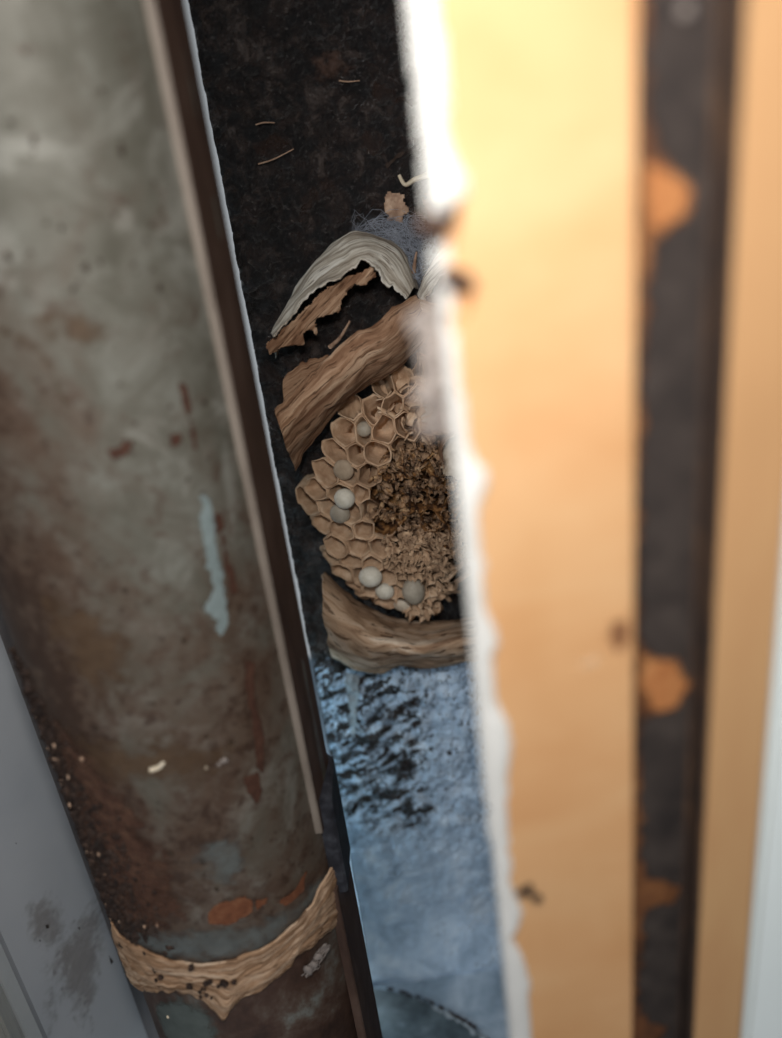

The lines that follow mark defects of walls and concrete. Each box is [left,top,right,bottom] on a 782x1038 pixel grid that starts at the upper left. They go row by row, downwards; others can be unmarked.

rust [108,440,133,460]
rust [169,382,197,450]
peeling [199,494,228,636]
rust [214,513,238,594]
rust [89,740,222,778]
rust [243,660,265,805]
rust [208,871,307,926]